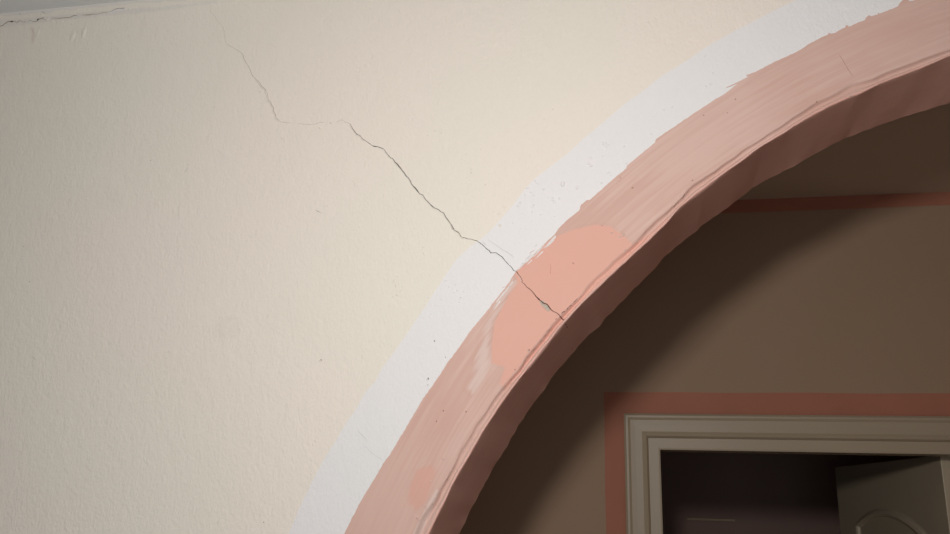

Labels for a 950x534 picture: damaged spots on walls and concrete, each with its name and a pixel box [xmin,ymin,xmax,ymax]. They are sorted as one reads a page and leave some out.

crack [210,9,577,328]